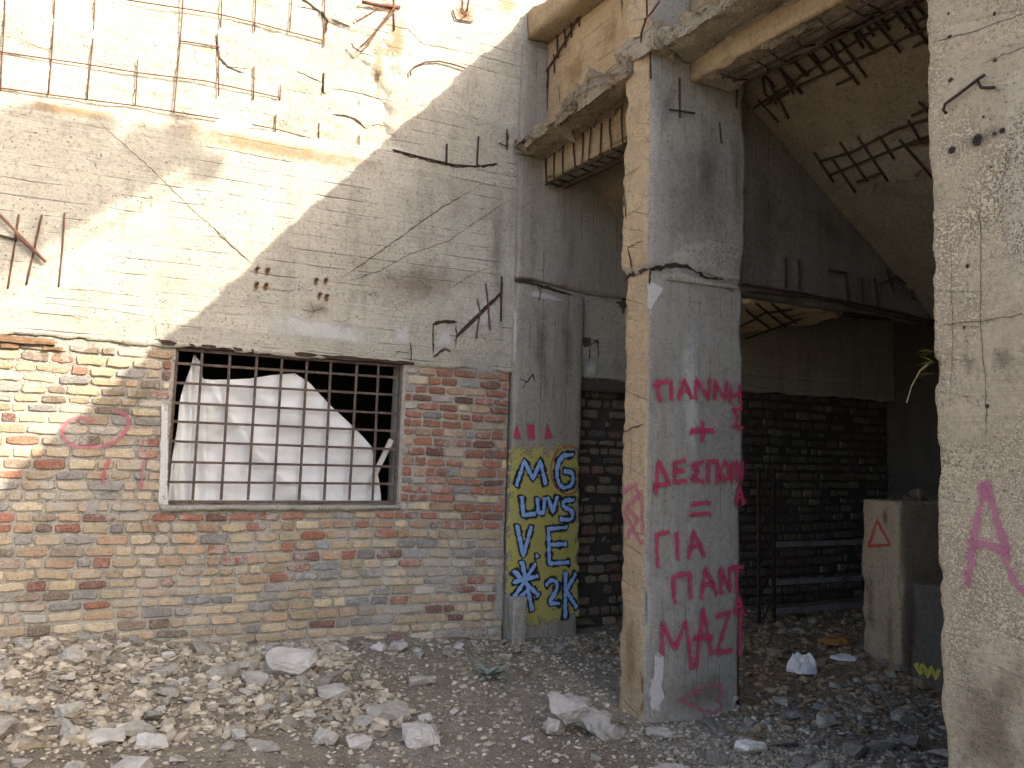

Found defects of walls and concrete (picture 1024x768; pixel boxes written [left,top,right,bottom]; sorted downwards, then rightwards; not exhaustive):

spalling [546,17,580,89]
spalling [697,0,929,123]
corrosion [46,104,105,116]
crack [96,119,251,263]
corrosion [231,136,311,158]
crack [339,189,505,285]
spalling [545,106,627,189]
crack [620,165,738,292]
spalling [813,101,933,197]
flaking render [645,651,673,739]